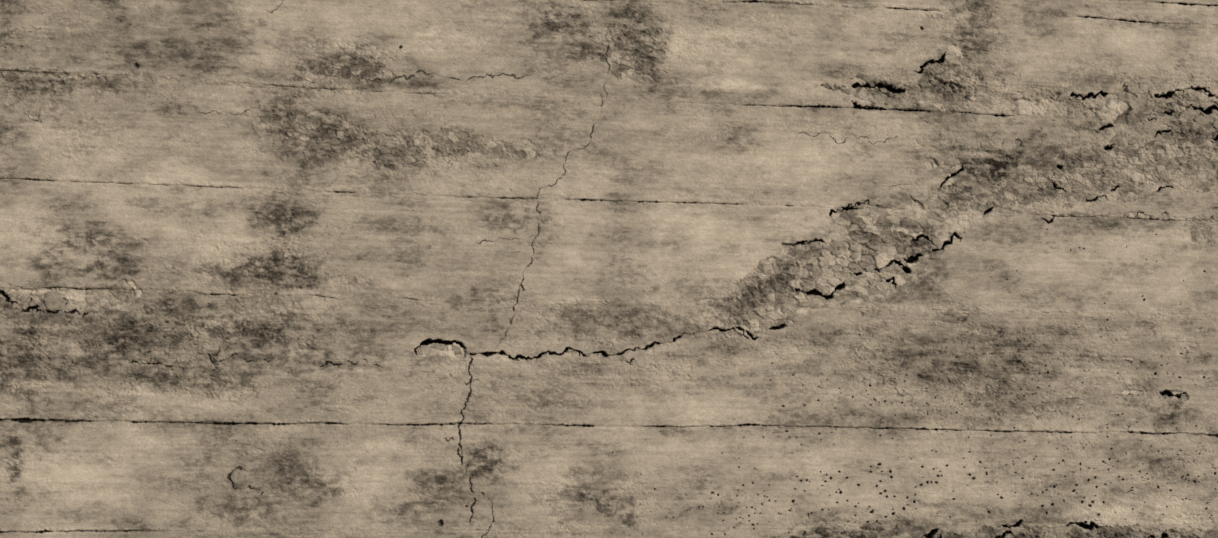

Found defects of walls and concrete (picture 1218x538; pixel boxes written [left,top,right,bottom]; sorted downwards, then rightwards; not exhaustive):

crack [354,69,563,82]
spalling [693,42,1218,337]
crack [445,33,761,538]
spalling [673,458,948,535]
spalling [921,353,1218,538]